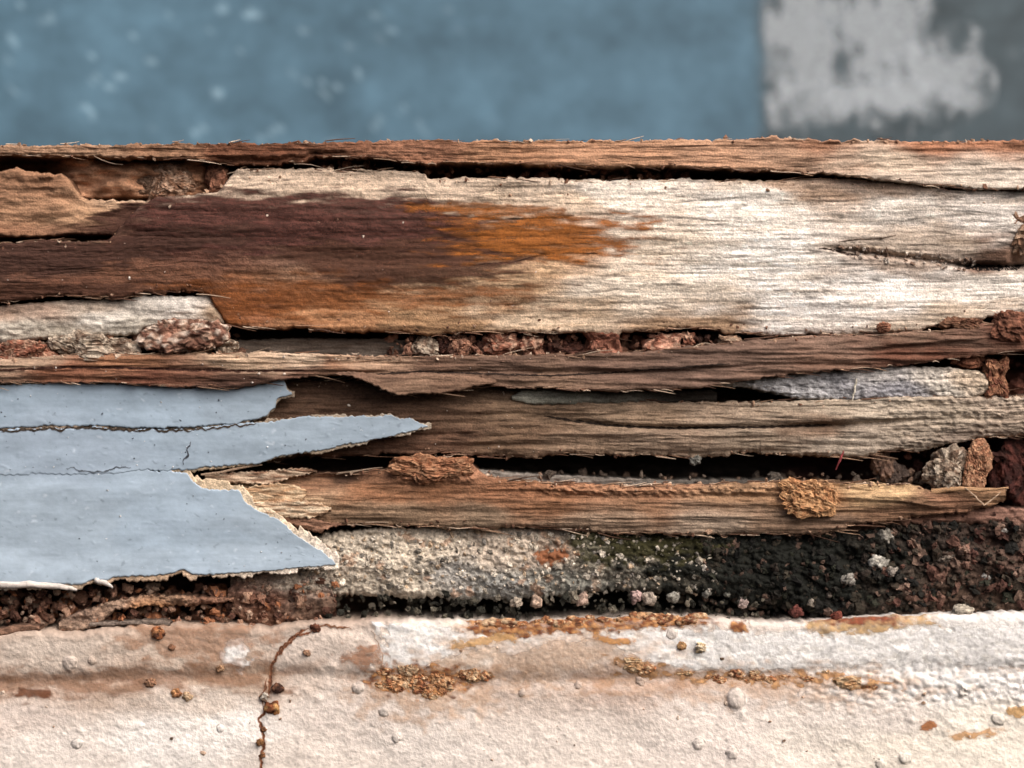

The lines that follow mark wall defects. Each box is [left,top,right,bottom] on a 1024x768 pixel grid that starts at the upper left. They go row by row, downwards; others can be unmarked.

crack [819,235,896,256]
crack [963,263,1024,271]
peeling [0,380,431,591]
damp [570,527,907,616]
crack [256,623,383,768]
corrosion [341,645,495,700]
corrosion [451,611,902,693]